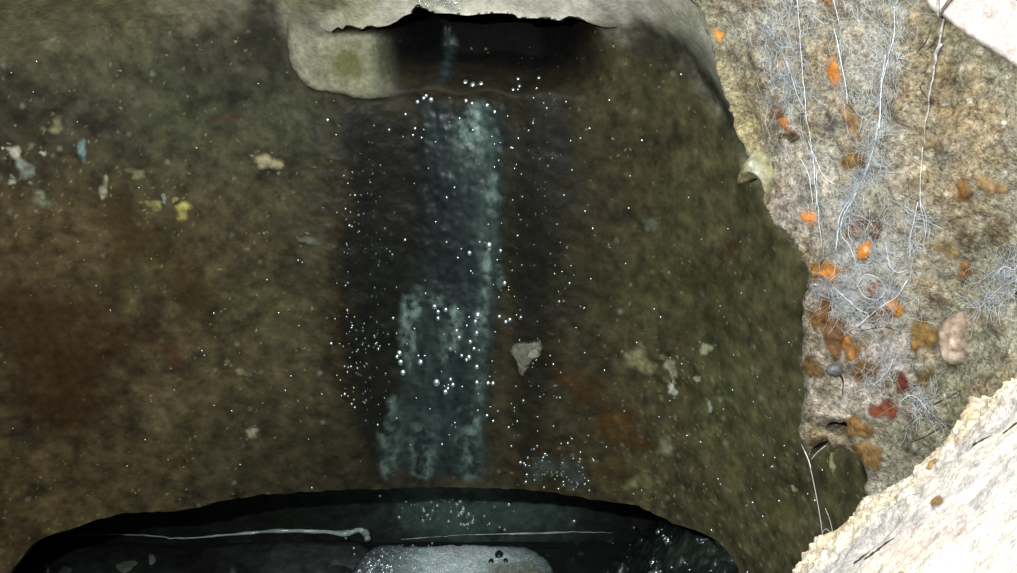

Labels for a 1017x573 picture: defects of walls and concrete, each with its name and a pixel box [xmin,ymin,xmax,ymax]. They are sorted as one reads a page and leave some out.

water stain [343,118,417,448]